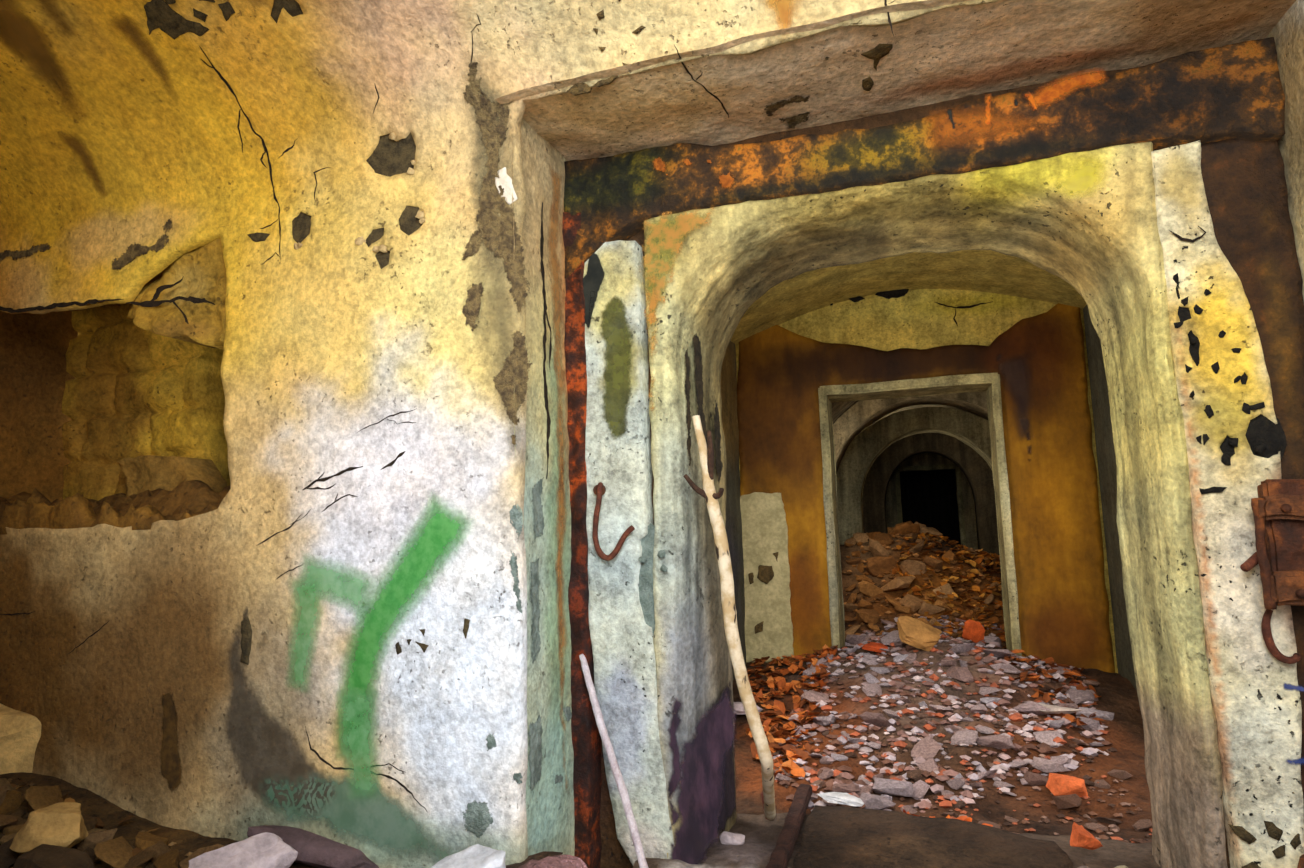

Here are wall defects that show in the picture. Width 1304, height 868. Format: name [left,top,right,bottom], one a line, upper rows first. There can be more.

rust [769,0,791,29]
crack [884,0,895,36]
rust [934,70,1104,145]
crack [200,47,298,265]
spalling [366,132,416,177]
crack [313,167,331,205]
peeling [460,62,528,312]
spalling [292,212,311,250]
spalling [399,206,425,235]
crack [0,276,215,324]
peeling [1173,273,1220,374]
spalling [1196,402,1287,465]